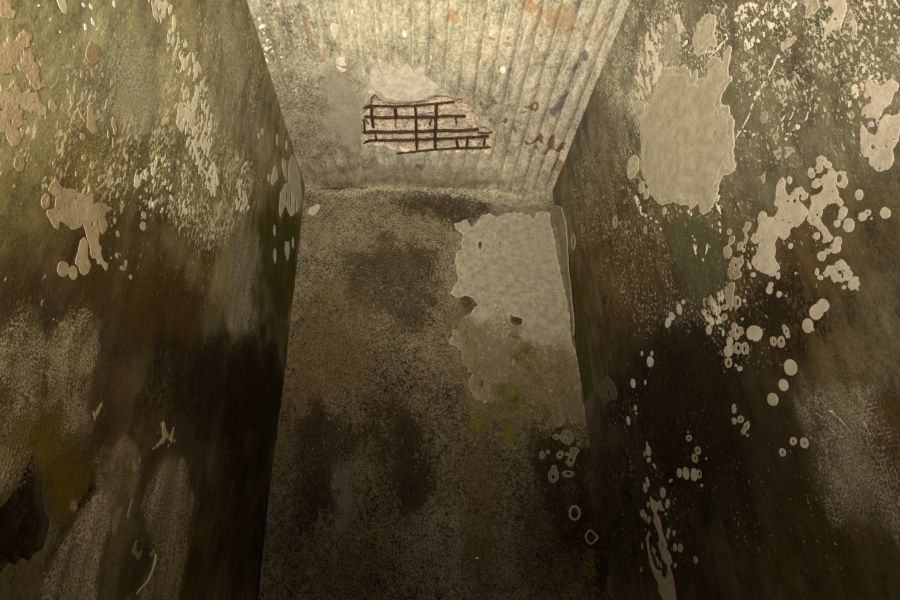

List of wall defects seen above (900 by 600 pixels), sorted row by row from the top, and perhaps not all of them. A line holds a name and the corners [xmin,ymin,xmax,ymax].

peeling [0,30,58,154]
peeling [41,155,132,279]
peeling [273,237,294,263]
peeling [268,134,302,236]
spalling [360,94,497,155]
flaking render [627,0,857,215]
peeling [701,156,890,371]
damp [0,216,284,493]
flaking render [449,205,585,478]
damp [291,396,438,533]
peeling [640,431,707,600]